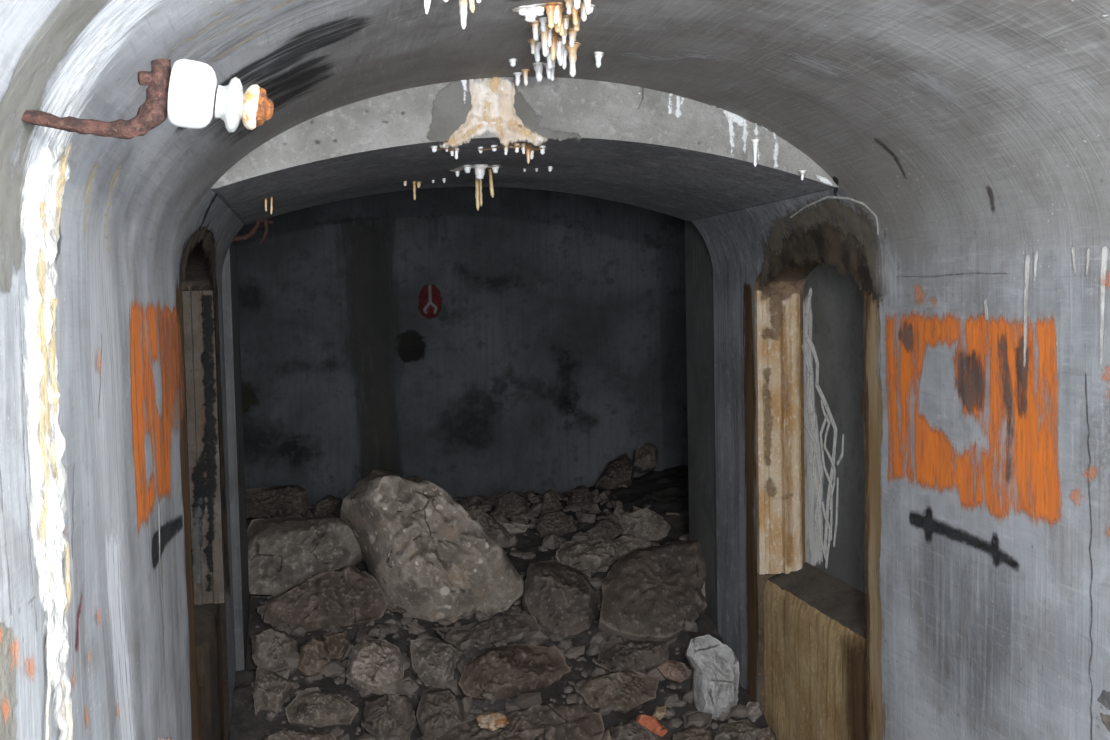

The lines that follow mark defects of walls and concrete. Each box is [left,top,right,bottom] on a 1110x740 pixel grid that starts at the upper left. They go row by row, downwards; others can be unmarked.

leakage [217,18,365,108]
peeling [427,79,476,142]
peeling [514,87,581,142]
efflorescence [668,93,684,118]
efflorescence [719,108,779,168]
efflorescence [1072,246,1108,373]
leakage [0,0,161,740]
crack [0,436,37,631]
leakage [158,503,167,691]